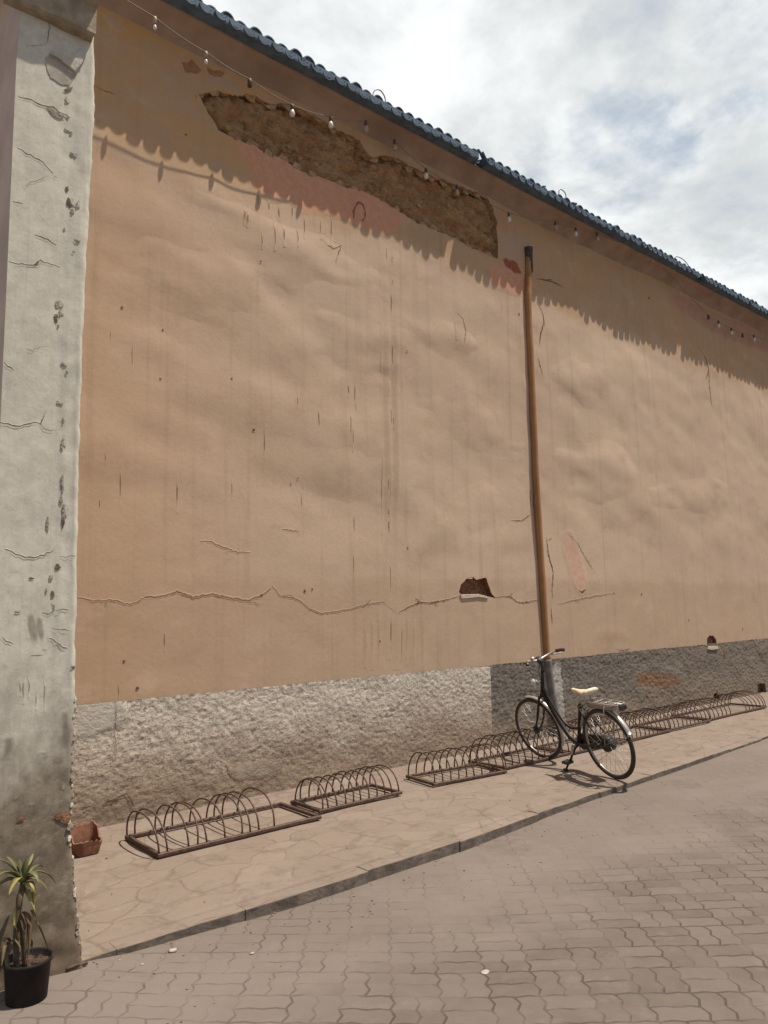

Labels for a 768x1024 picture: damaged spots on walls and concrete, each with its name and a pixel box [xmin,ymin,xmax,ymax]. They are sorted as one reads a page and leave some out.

crack [19,96,70,119]
spalling [180,58,529,299]
spalling [65,186,80,214]
spalling [54,300,64,328]
crack [0,410,57,431]
spalling [46,475,69,532]
crack [5,548,69,558]
spalling [459,577,495,599]
crack [42,586,459,648]
spalling [706,635,726,654]